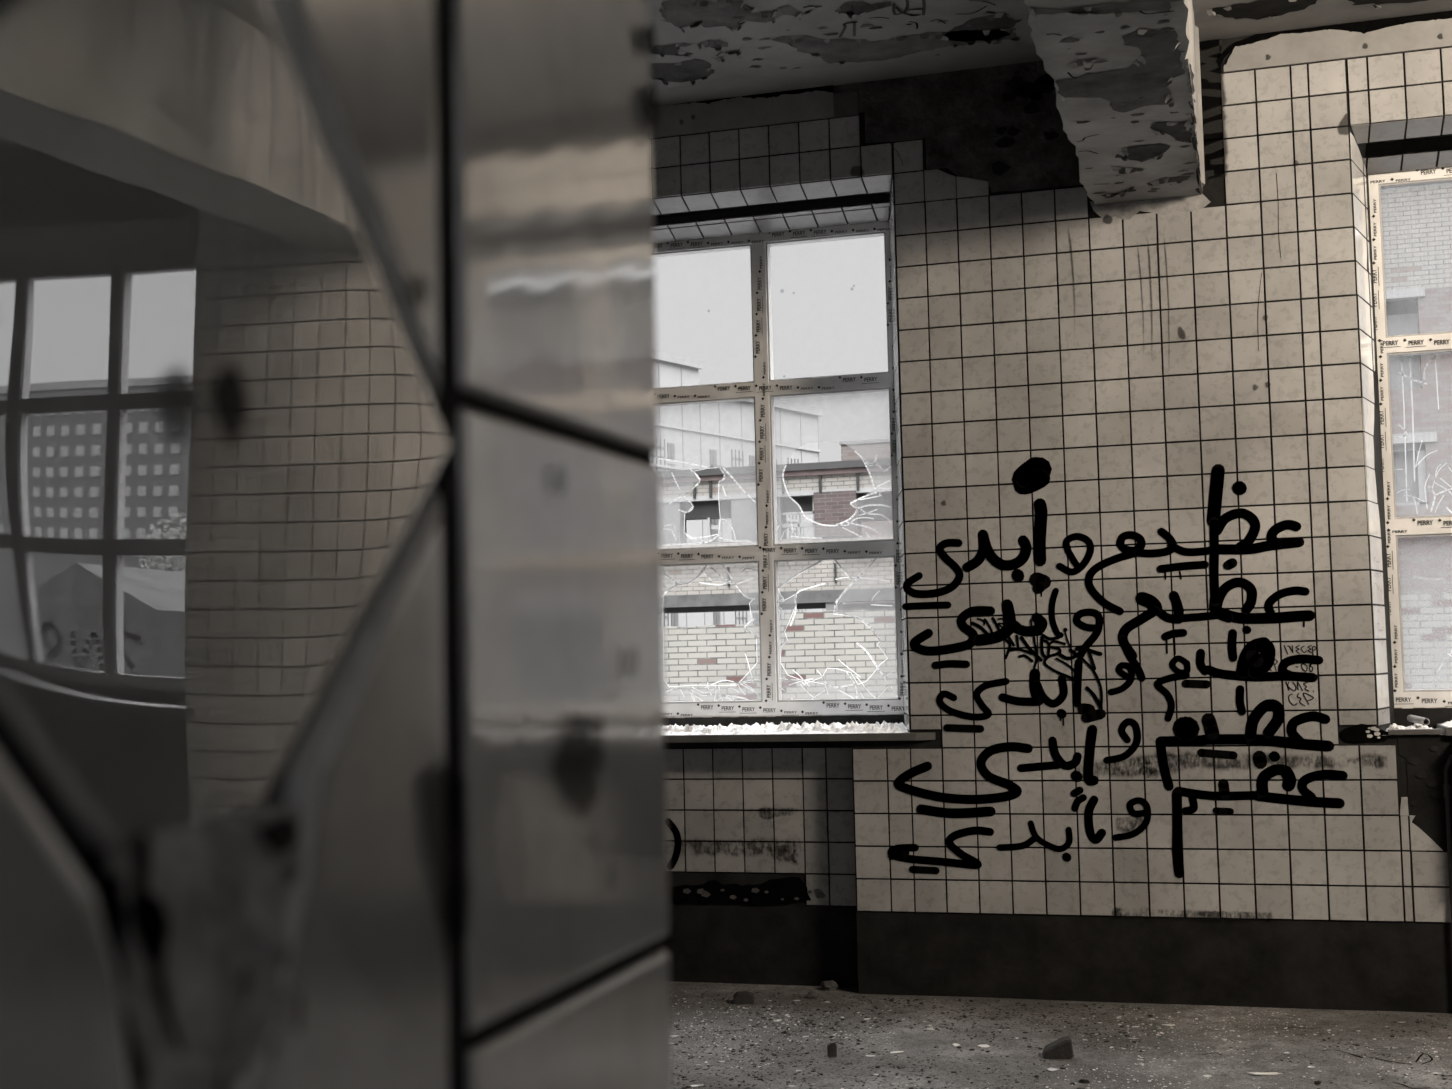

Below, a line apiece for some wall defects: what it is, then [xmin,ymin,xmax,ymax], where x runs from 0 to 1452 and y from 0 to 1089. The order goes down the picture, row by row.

peeling [1206,0,1317,20]
peeling [1348,0,1428,9]
peeling [642,0,1202,198]